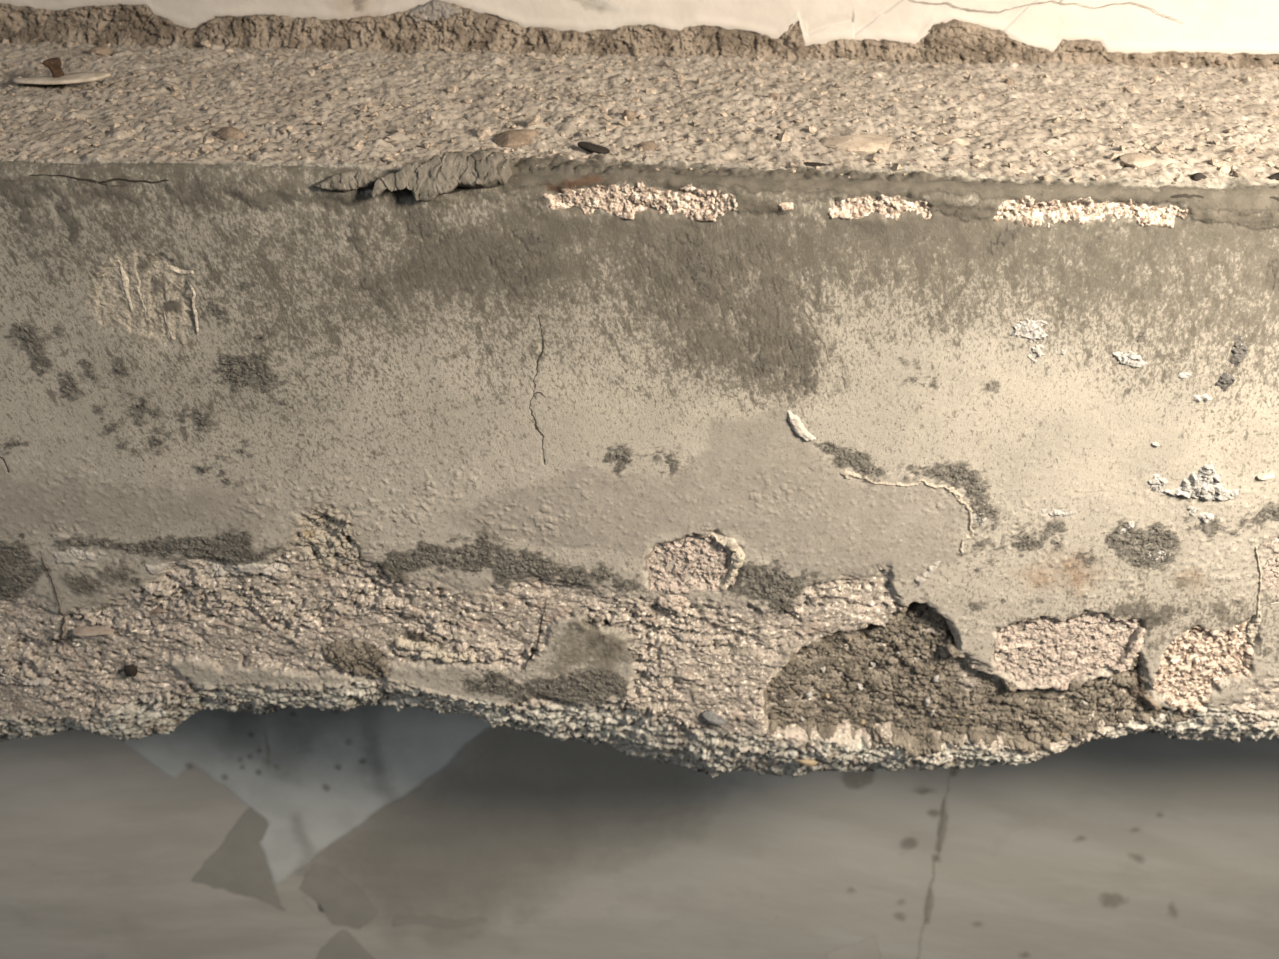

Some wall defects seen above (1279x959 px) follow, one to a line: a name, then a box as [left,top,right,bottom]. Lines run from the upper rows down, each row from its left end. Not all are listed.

spalling [409,0,463,23]
spalling [924,19,1005,48]
spalling [1060,39,1103,53]
water stain [503,155,1279,229]
water stain [623,212,842,400]
crack [529,315,546,465]
peeling [51,549,100,565]
peeling [210,503,368,580]
spalling [645,532,745,613]
peeling [839,468,974,556]
spalling [321,640,391,679]
spalling [763,602,1261,757]